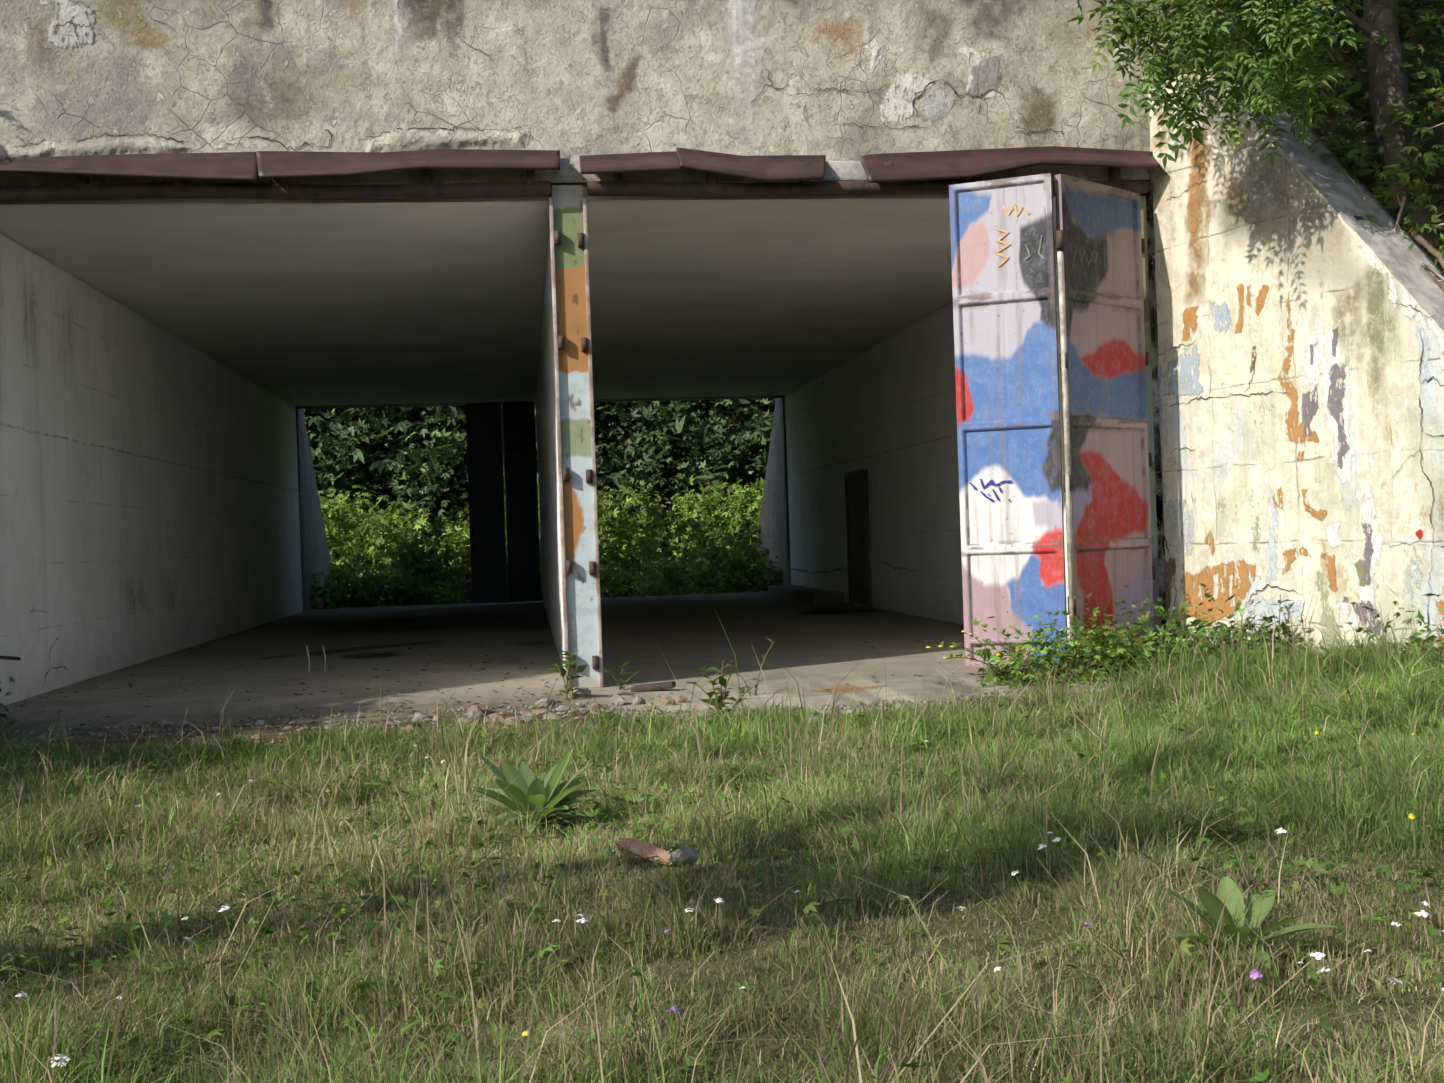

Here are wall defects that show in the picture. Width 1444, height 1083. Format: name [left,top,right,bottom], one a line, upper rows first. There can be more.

water stain [394,0,461,44]
crack [690,47,929,141]
crack [941,79,1066,141]
corrosion [1186,131,1210,258]
crack [1157,339,1288,407]
peeling [1158,284,1444,657]
crack [1382,303,1444,645]
crack [1163,535,1177,639]
crack [1247,584,1305,644]